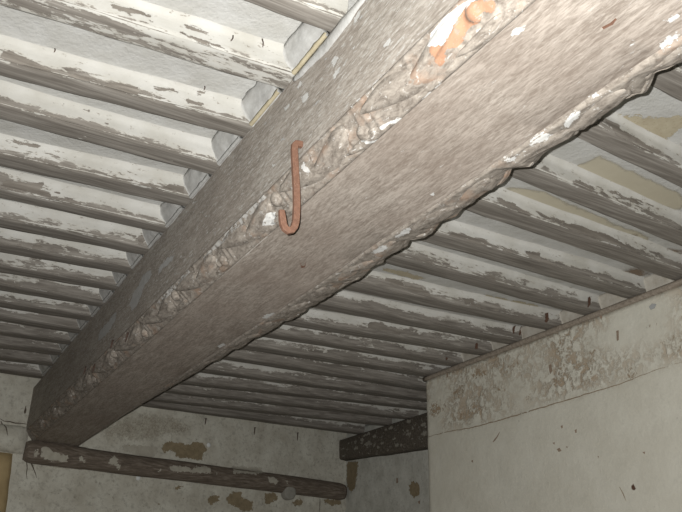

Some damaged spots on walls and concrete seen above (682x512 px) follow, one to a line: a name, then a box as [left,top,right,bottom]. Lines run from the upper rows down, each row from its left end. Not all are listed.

peeling [110,4,153,22]
peeling [427,0,475,47]
peeling [180,24,228,52]
peeling [0,49,51,72]
peeling [564,110,580,128]
peeling [618,114,682,139]
peeling [504,129,553,163]
peeling [0,180,81,204]
peeling [262,212,276,226]
peeling [497,197,642,254]
crack [429,362,681,442]
flaking render [162,441,207,461]